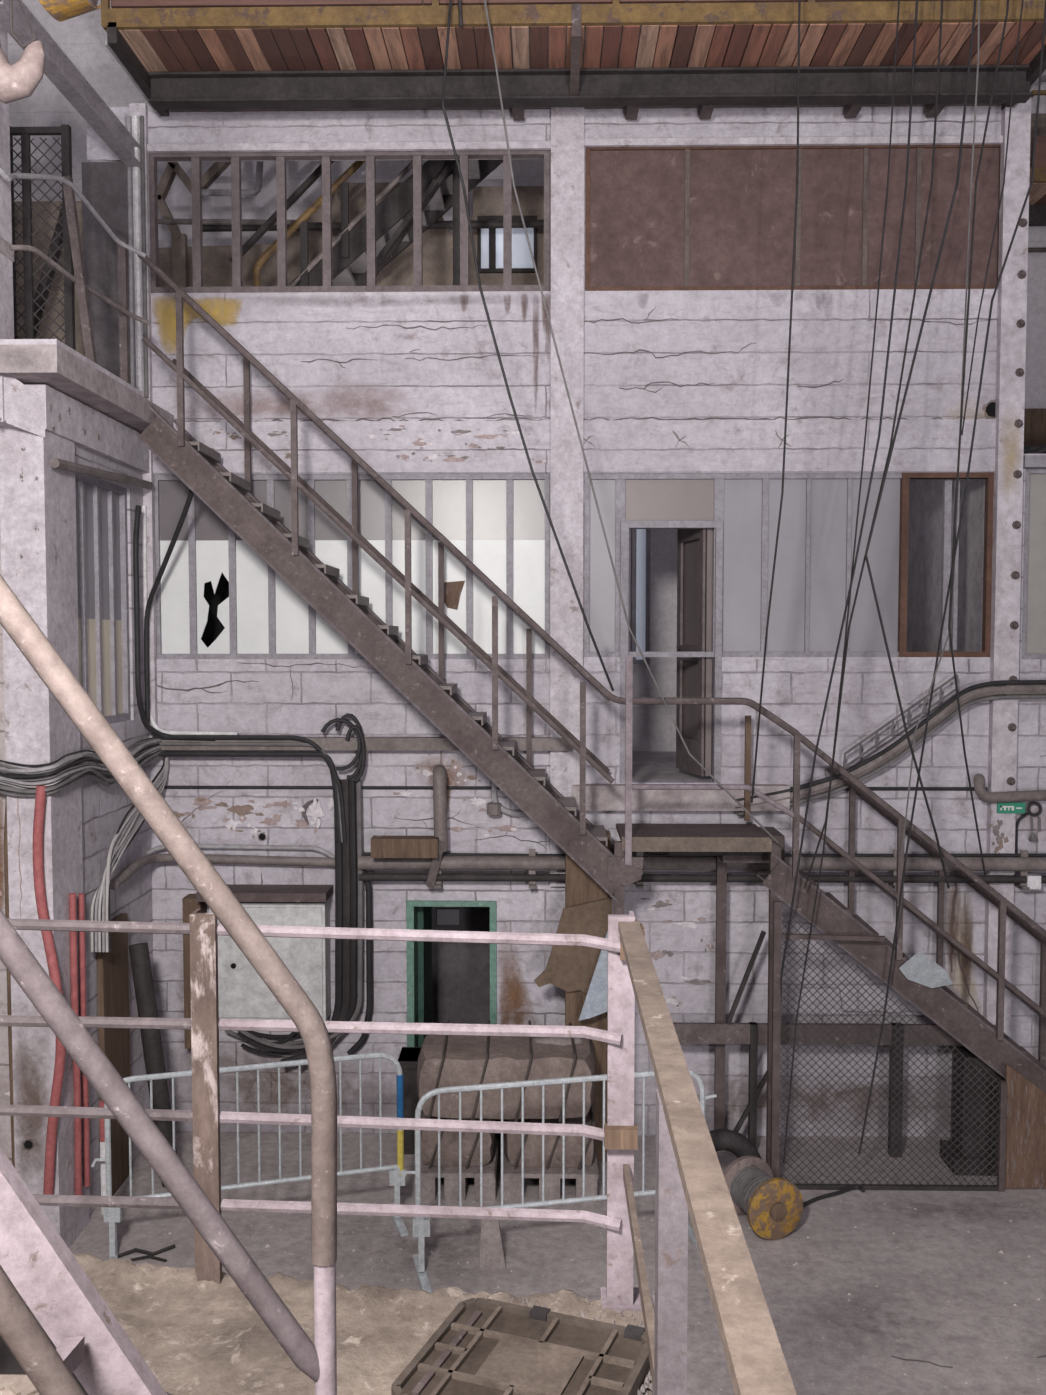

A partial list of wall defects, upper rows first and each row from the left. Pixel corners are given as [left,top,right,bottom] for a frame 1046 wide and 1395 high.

crack [301,325,536,368]
leakage [506,300,550,377]
crack [583,307,994,449]
crack [255,412,551,421]
spalling [174,796,317,841]
corrosion [502,969,525,1025]